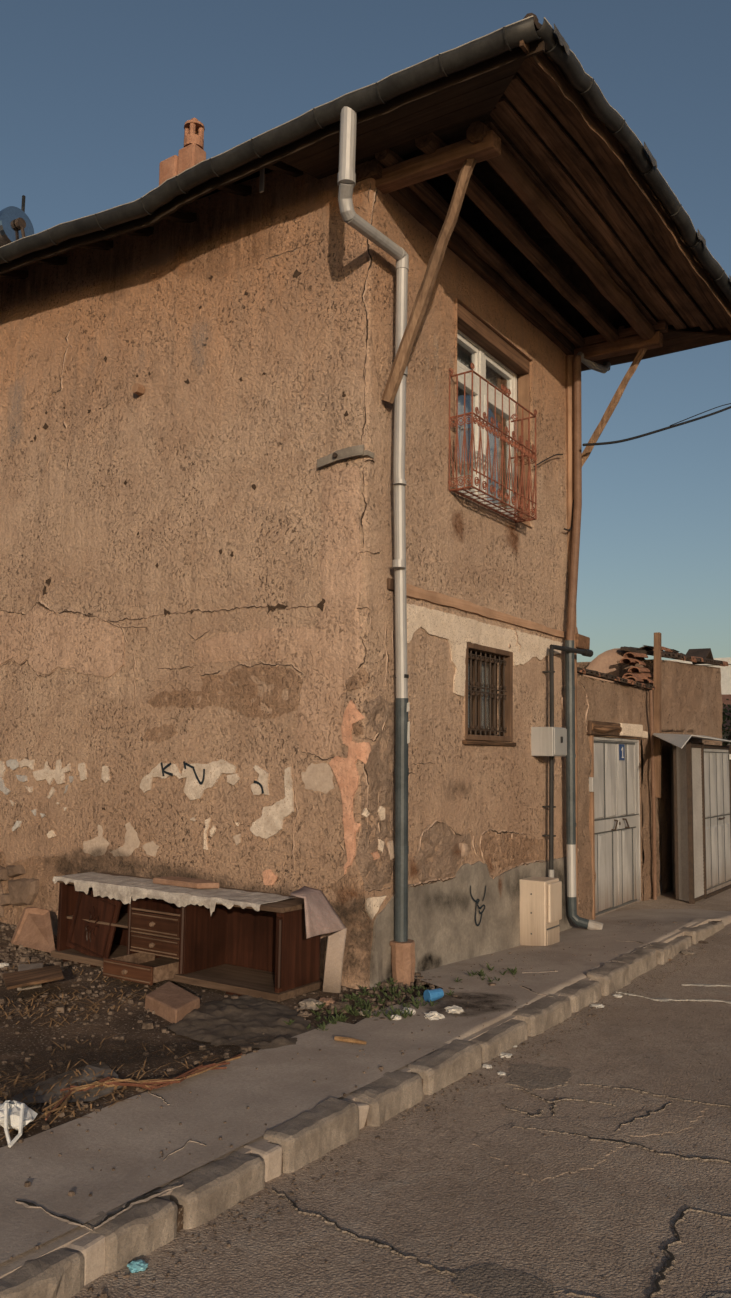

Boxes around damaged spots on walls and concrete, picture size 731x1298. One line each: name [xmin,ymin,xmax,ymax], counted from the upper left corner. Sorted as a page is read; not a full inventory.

crack [0,590,317,716]
peeling [407,604,563,697]
peeling [0,759,110,839]
flaking render [140,666,394,930]
spalling [0,807,160,936]
crack [501,1083,731,1164]
crack [272,1189,455,1275]
crack [566,1290,597,1298]
crack [648,1206,731,1298]